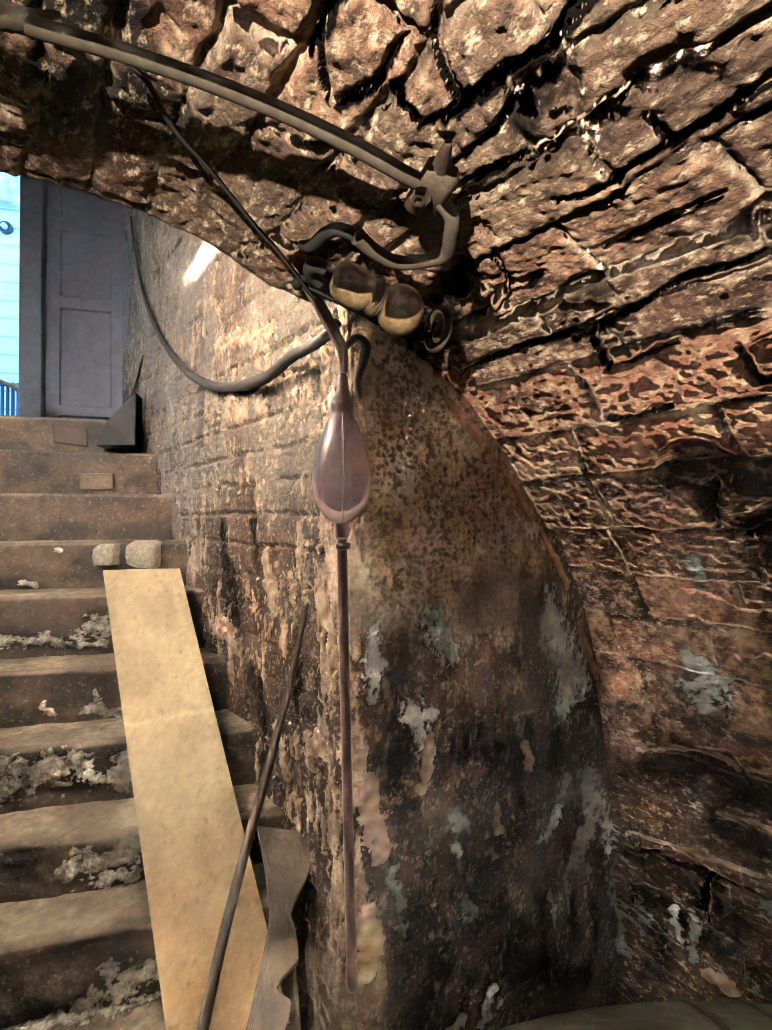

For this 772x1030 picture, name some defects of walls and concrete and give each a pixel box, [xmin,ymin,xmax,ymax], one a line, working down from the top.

damp [218,519,243,635]
damp [249,513,259,563]
damp [419,595,464,670]
damp [245,655,268,734]
damp [359,620,440,791]
damp [440,582,772,1030]